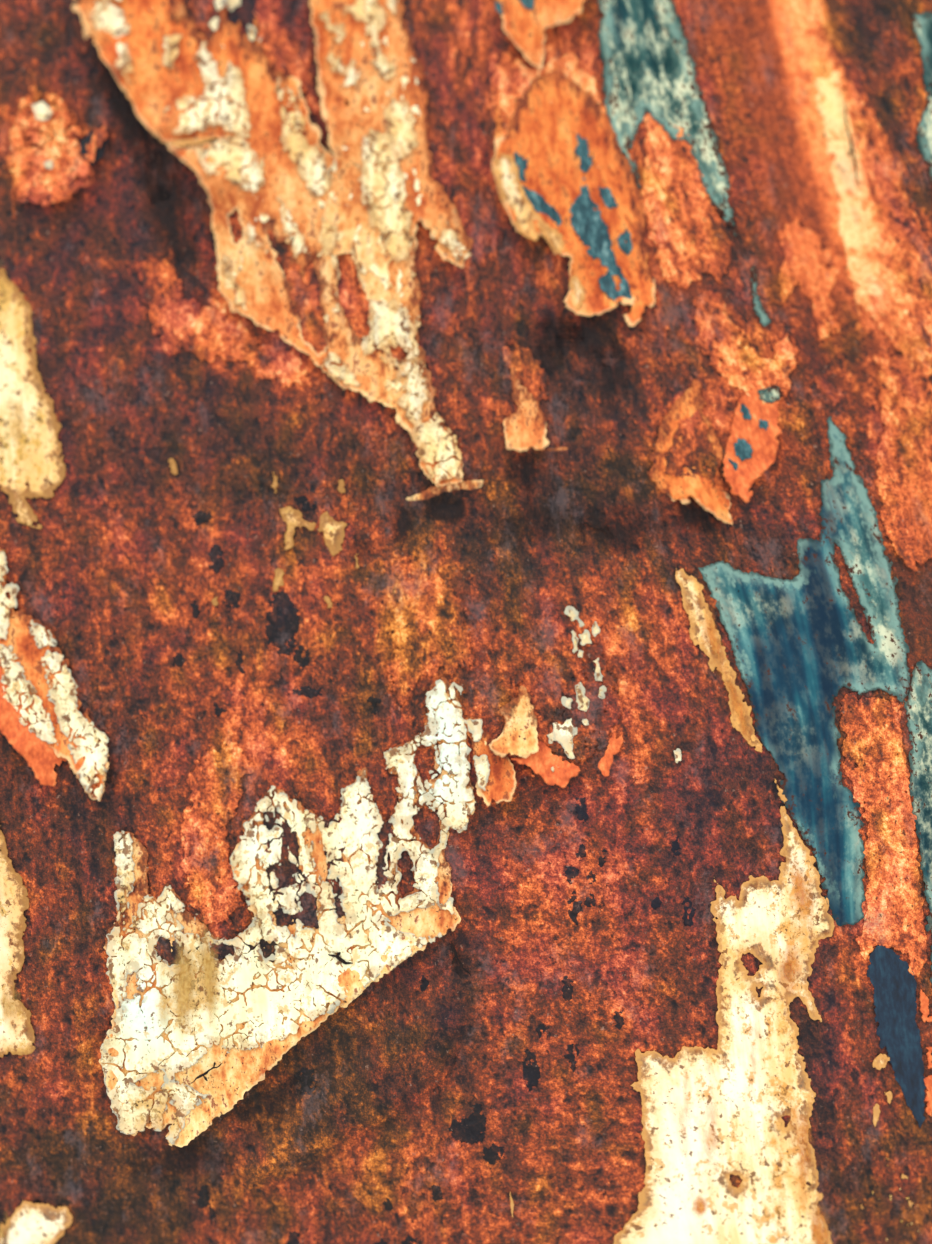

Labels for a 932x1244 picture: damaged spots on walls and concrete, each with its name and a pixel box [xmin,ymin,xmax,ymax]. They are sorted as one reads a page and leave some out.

corrosion [135,230,328,388]
peeling [71,0,484,501]
peeling [492,0,738,327]
corrosion [641,113,799,404]
corrosion [776,66,932,572]
peeling [0,548,109,802]
crack [191,1062,222,1083]
crack [328,952,353,964]
peeling [99,606,623,1147]
crack [451,942,471,976]
peeling [613,416,932,1244]
corrosion [839,692,927,977]